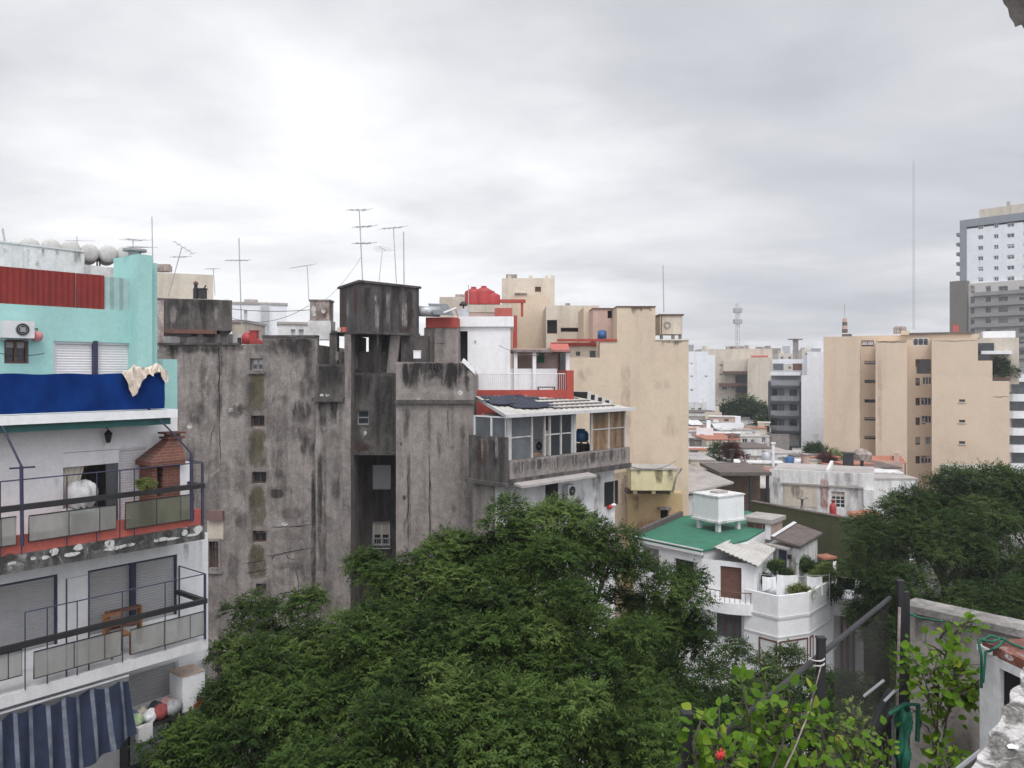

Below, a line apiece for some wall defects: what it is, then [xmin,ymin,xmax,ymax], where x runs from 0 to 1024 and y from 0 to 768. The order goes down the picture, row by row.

damp [365,288,412,342]
damp [403,363,469,390]
crack [210,347,221,465]
damp [250,486,283,524]
peeling [30,525,203,560]